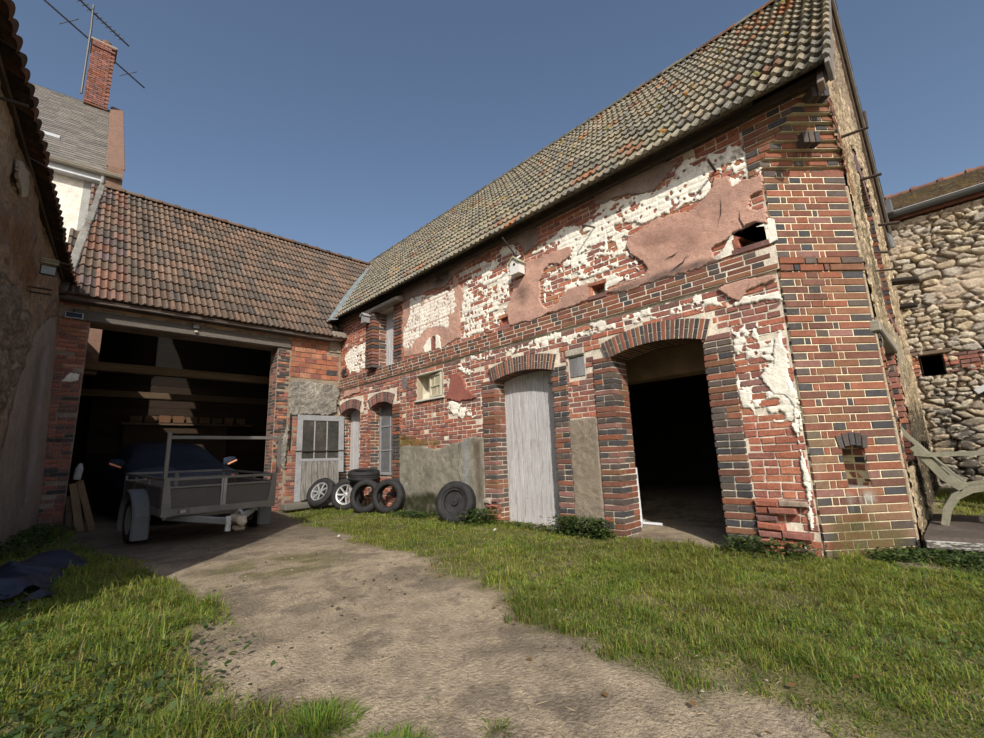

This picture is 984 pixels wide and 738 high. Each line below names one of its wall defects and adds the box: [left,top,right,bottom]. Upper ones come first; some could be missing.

peeling [594,161,677,207]
peeling [401,249,491,357]
peeling [489,175,778,335]